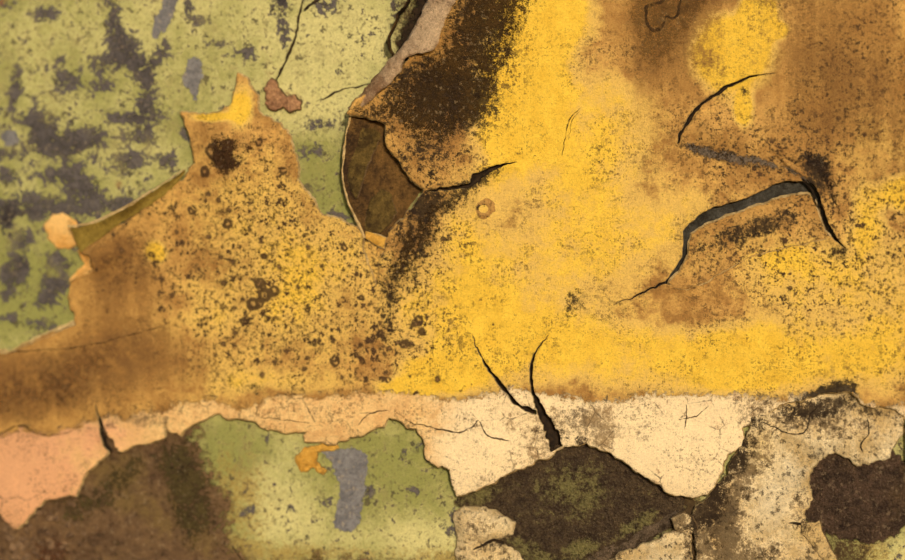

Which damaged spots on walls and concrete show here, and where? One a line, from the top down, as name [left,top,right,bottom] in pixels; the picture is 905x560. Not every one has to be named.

peeling [95,0,178,133]
peeling [264,78,303,113]
peeling [359,0,456,107]
crack [678,73,774,162]
peeling [341,116,422,238]
crack [788,170,847,251]
crack [619,282,665,302]
crack [0,411,113,453]
crack [474,338,563,450]
spalling [452,443,688,560]
peeling [609,392,905,560]
crack [763,407,817,435]